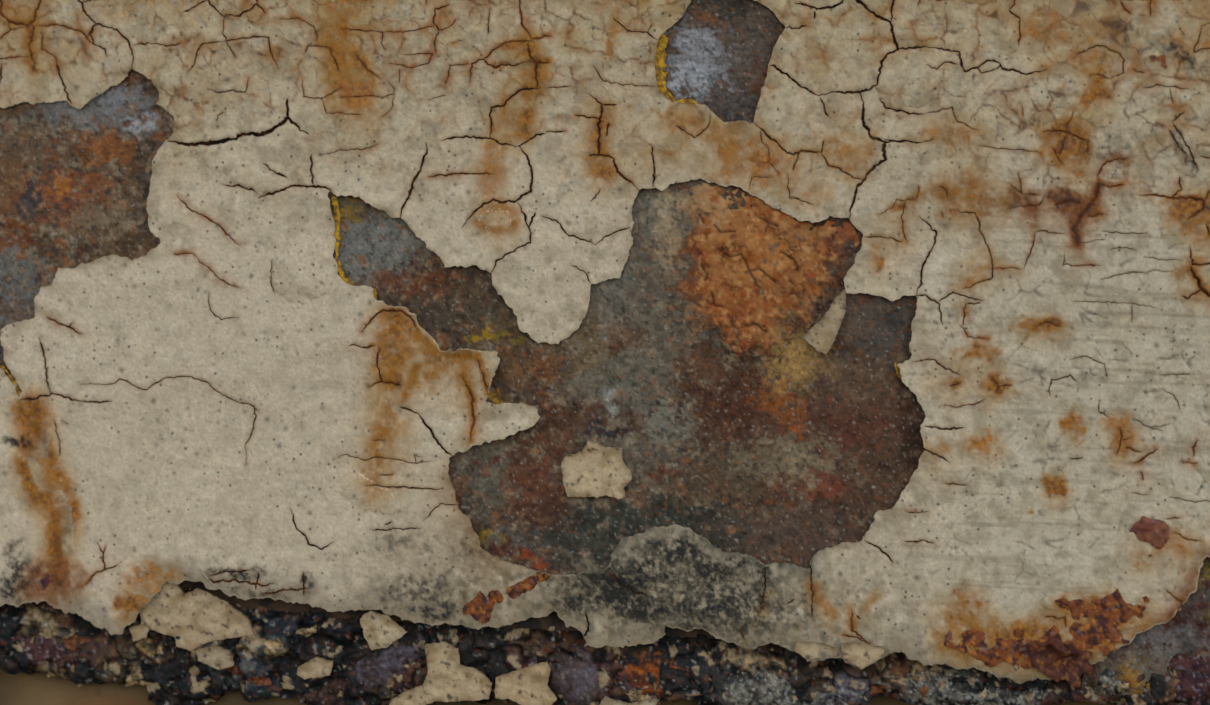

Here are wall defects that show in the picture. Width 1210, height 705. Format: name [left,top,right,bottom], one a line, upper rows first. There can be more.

peeling [0,70,174,397]
crack [0,0,658,283]
rust [322,0,375,118]
peeling [654,0,785,123]
crack [749,0,1210,339]
rust [374,307,489,464]
rust [0,392,1210,705]
peeling [328,178,926,575]
crack [864,511,932,562]
crack [915,359,1010,485]
crack [1048,355,1210,541]
peeling [1082,557,1210,705]